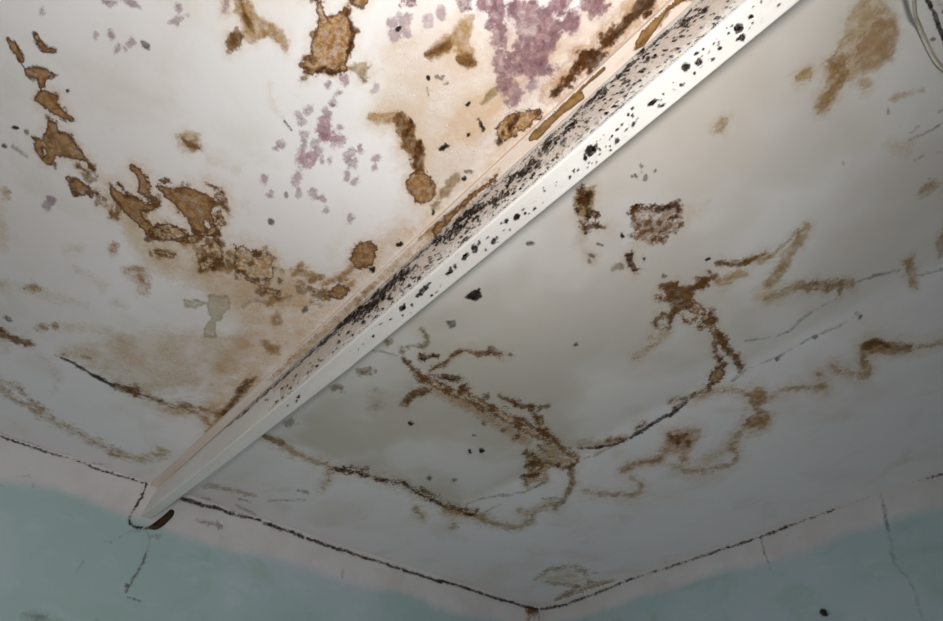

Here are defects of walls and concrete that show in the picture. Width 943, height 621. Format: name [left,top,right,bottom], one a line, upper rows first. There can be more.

peeling [298,0,368,82]
peeling [634,0,687,50]
damp [821,0,895,108]
crack [925,0,943,41]
damp [180,133,200,152]
peeling [418,174,497,239]
damp [265,0,762,406]
damp [860,339,912,379]
damp [746,391,768,427]
damp [667,433,691,447]
crack [180,497,840,619]